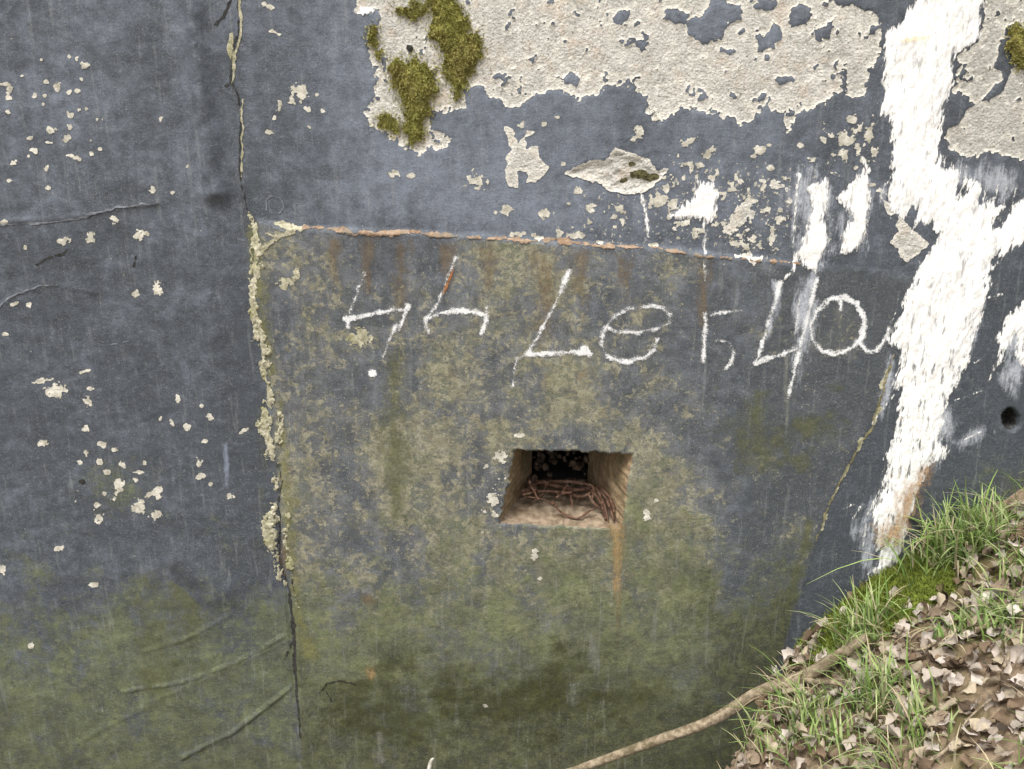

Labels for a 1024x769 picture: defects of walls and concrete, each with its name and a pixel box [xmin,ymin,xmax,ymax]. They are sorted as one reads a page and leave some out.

peeling [10,107,103,165]
peeling [32,55,90,106]
crack [214,0,249,214]
peeling [354,0,882,266]
peeling [944,0,1024,161]
peeling [820,114,929,262]
peeling [133,229,150,241]
rust [302,225,801,265]
peeling [32,378,68,399]
peeling [77,441,146,525]
peeling [131,486,163,521]
crack [816,354,894,541]